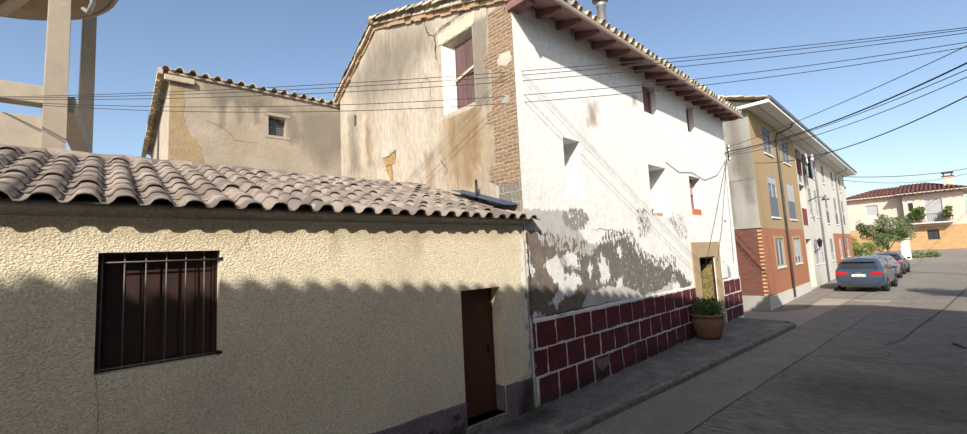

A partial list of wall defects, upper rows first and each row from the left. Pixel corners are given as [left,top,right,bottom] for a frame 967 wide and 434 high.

crack [421,5,506,97]
spalling [382,150,396,180]
peeling [520,208,692,379]